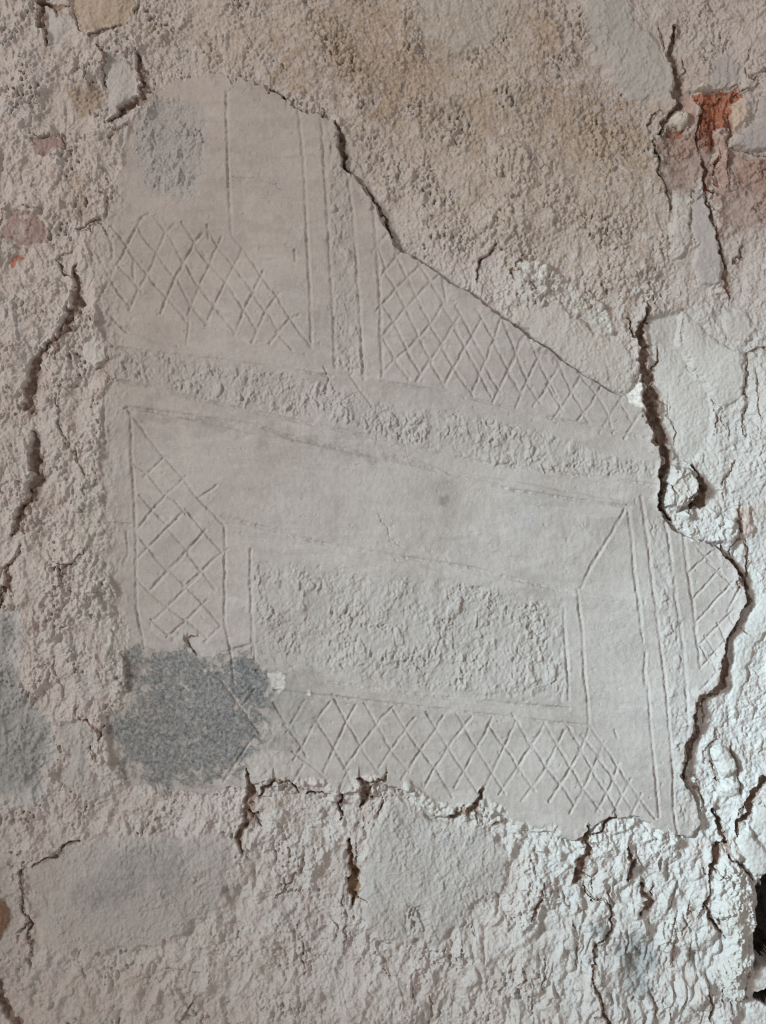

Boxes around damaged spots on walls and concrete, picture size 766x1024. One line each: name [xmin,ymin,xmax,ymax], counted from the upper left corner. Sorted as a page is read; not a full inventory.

spalling [132,95,209,204]
spalling [320,119,367,376]
crack [646,25,766,299]
crack [0,190,116,609]
spalling [117,347,660,481]
leakage [74,445,286,797]
crack [235,768,388,955]
spalling [258,774,386,805]
spalling [251,560,571,702]
crack [449,788,503,826]
spalling [402,508,740,871]
crack [572,308,766,1024]